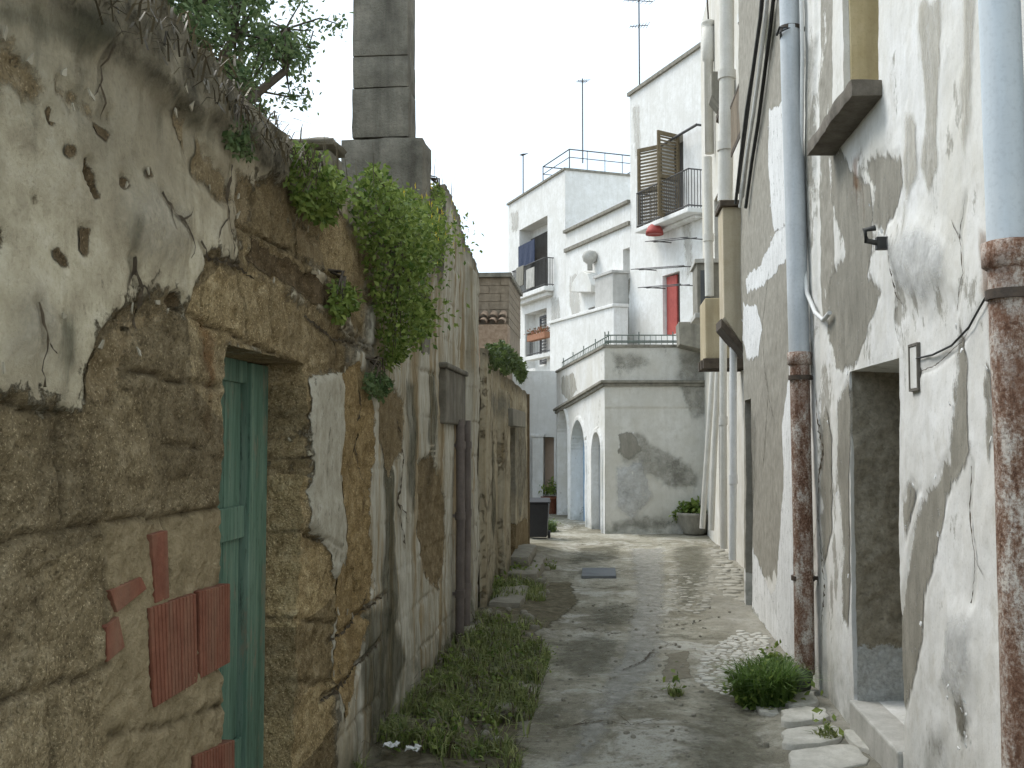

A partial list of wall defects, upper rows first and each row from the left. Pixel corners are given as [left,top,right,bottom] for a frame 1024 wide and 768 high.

crack [94,43,116,120]
spalling [53,247,69,268]
spalling [65,144,101,199]
spalling [79,227,91,256]
crack [162,165,254,279]
peeling [172,83,337,306]
peeling [84,291,179,406]
peeling [820,147,902,628]
peeling [983,363,993,458]
peeling [416,453,446,589]
peeling [902,323,970,707]
crack [969,466,983,603]